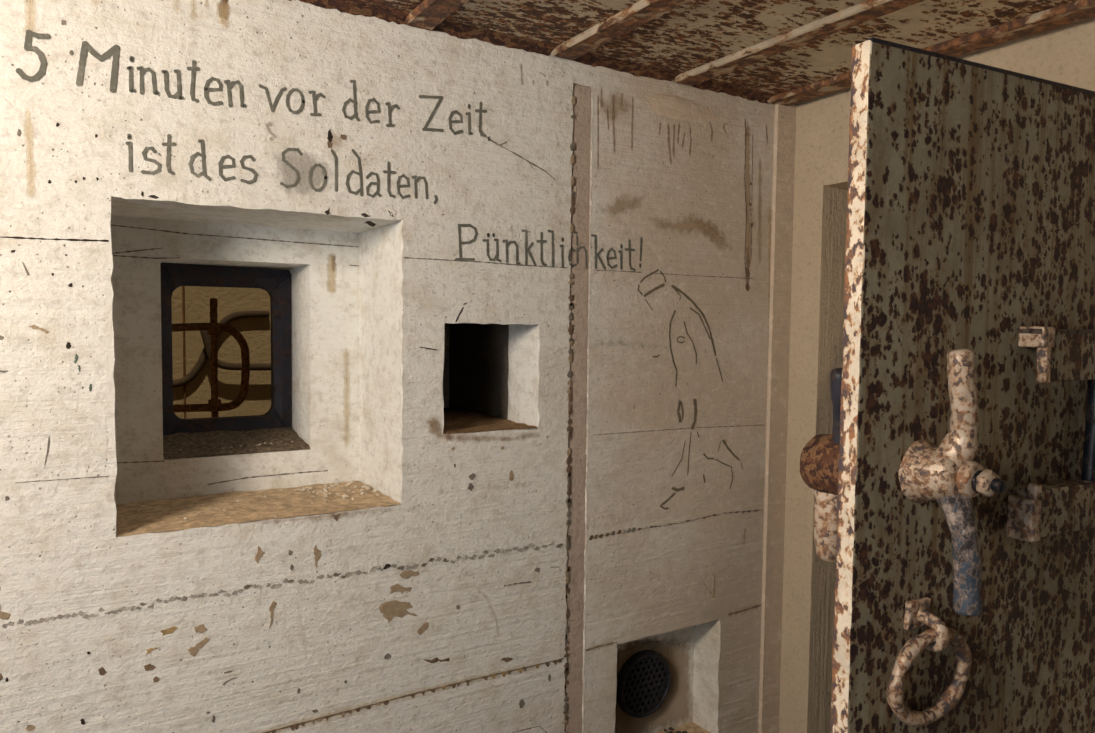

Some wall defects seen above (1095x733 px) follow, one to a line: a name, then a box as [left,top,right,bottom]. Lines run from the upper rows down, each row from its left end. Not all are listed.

corrosion [220,0,228,19]
corrosion [289,0,557,56]
corrosion [573,52,680,81]
corrosion [692,79,776,105]
spalling [327,129,347,149]
damp [598,90,633,167]
damp [659,123,691,162]
spalling [361,208,397,227]
peeling [0,268,573,733]